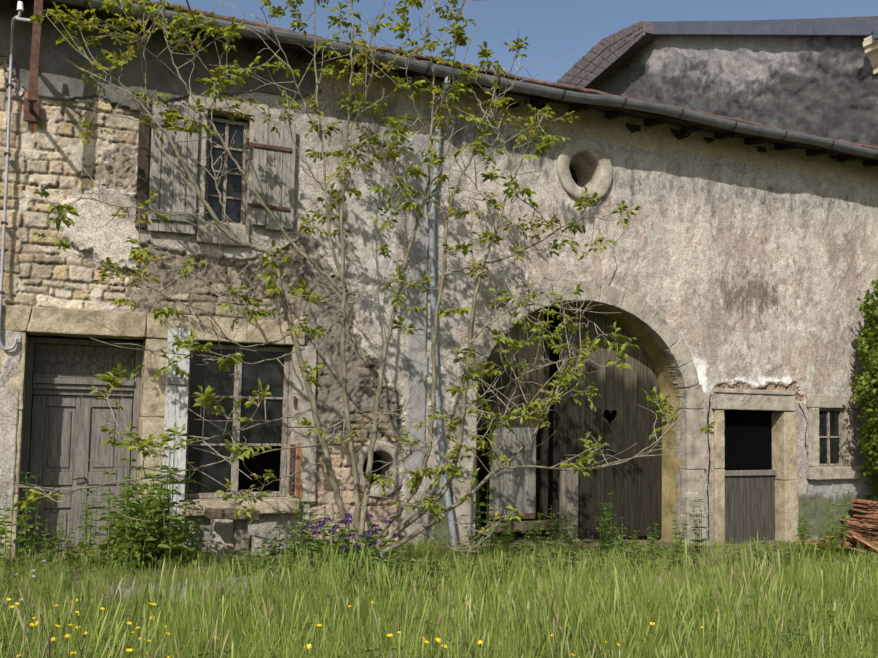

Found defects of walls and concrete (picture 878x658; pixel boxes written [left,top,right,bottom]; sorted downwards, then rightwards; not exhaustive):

spalling [0,61,406,547]
leakage [608,36,878,147]